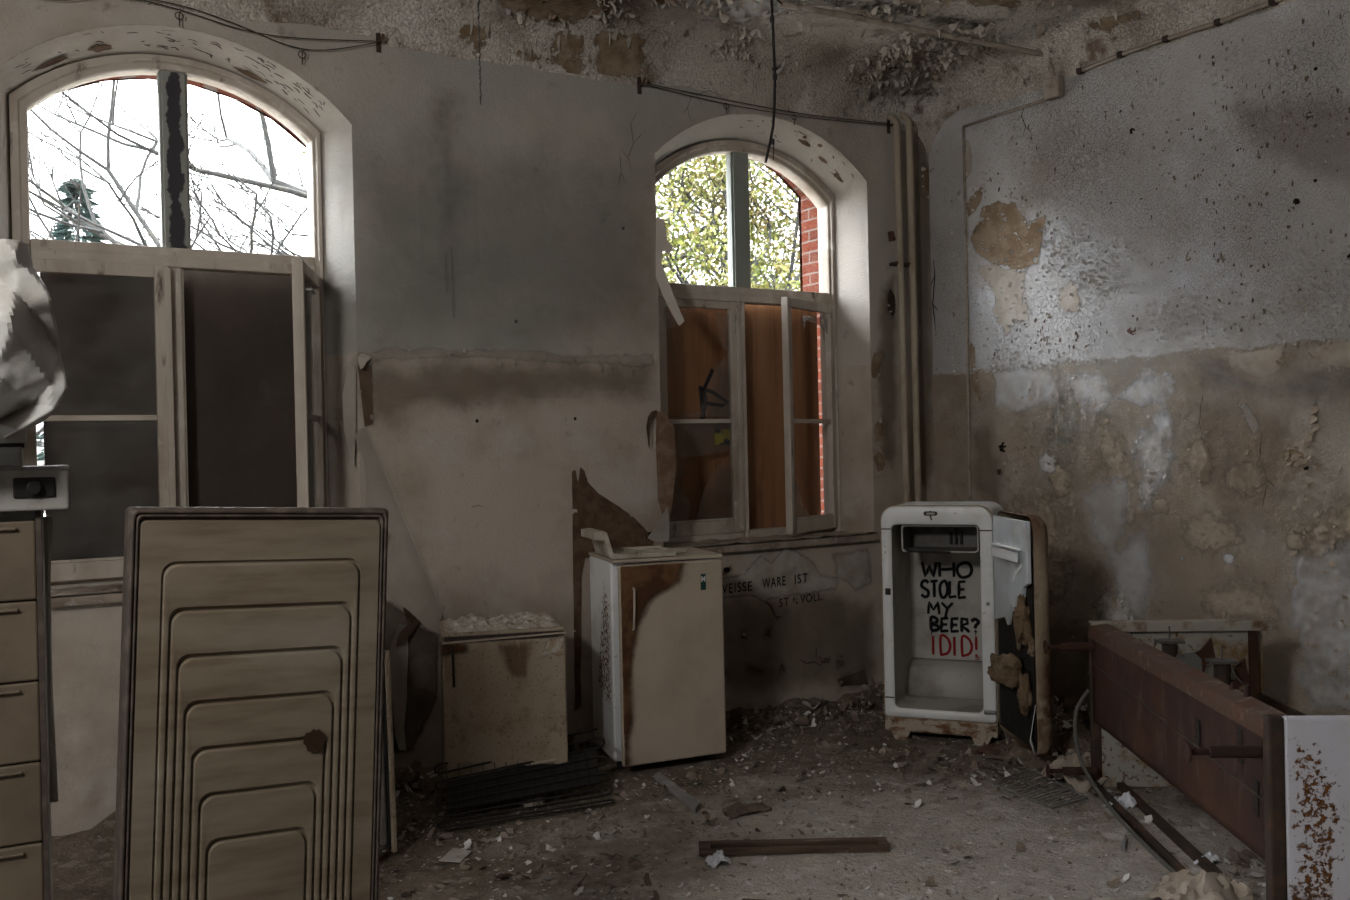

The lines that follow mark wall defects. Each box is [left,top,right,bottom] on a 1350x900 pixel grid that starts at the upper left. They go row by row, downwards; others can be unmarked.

peeling [459,0,837,85]
peeling [831,0,1140,94]
peeling [1198,41,1285,129]
peeling [1219,49,1350,186]
peeling [1205,198,1280,332]
flaking render [1300,505,1350,560]
flaking render [1200,579,1280,628]
water stain [1294,551,1350,708]